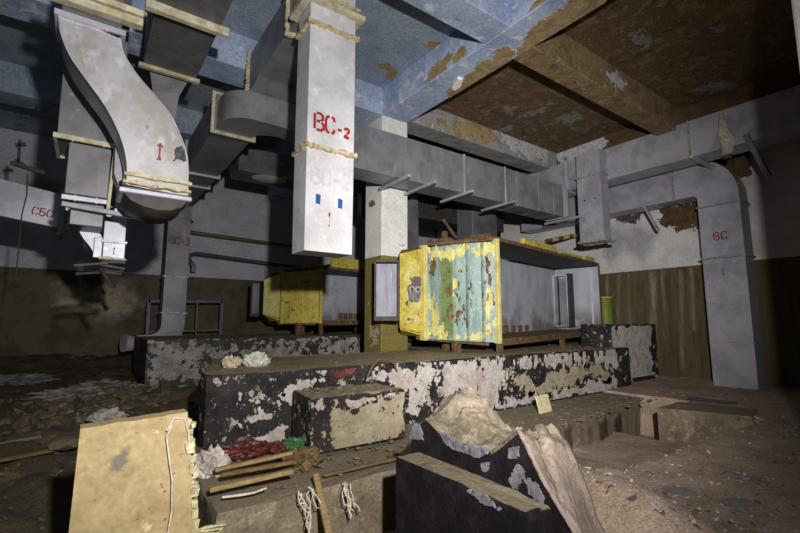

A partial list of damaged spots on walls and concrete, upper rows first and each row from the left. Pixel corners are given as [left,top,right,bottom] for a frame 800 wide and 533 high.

peeling [378,63,398,80]
peeling [424,45,467,85]
spalling [446,0,605,97]
peeling [711,151,752,178]
peeling [657,201,700,234]
peeling [236,370,327,442]
peeling [320,325,656,452]
peeling [438,431,490,472]
peeling [507,446,545,504]
peeling [579,406,800,533]
peeling [466,489,502,511]